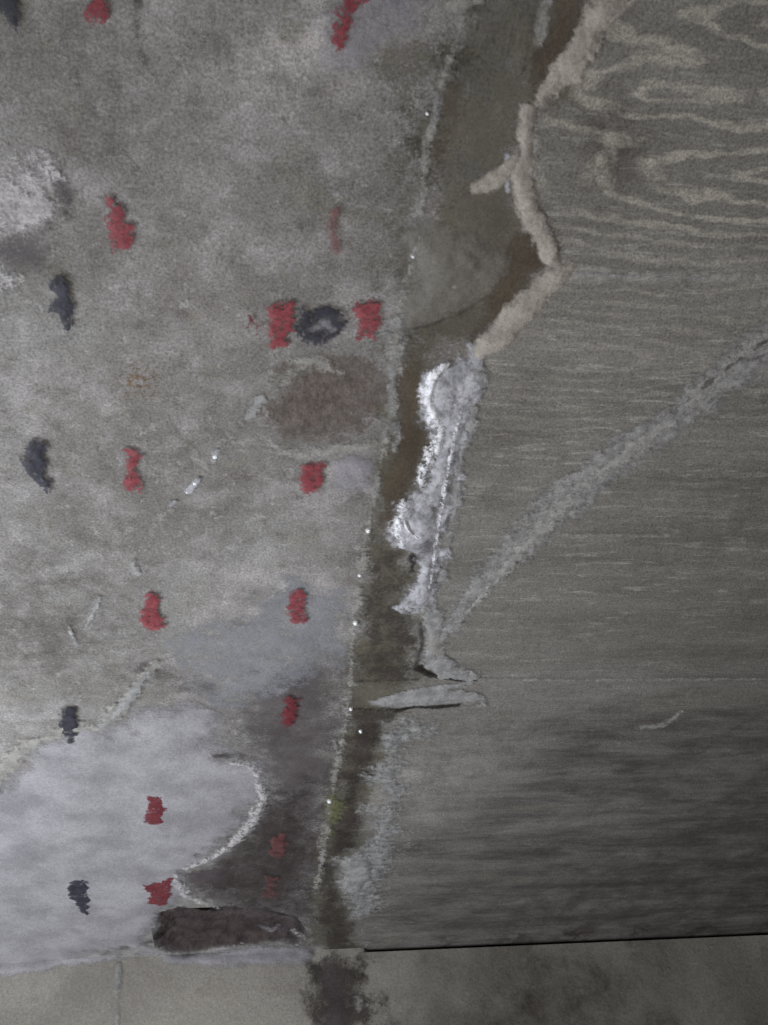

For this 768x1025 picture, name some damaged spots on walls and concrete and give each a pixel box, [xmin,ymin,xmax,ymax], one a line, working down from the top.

peeling [0,702,313,976]
leakage [165,0,638,1025]
crack [313,15,768,889]
crack [535,0,553,46]